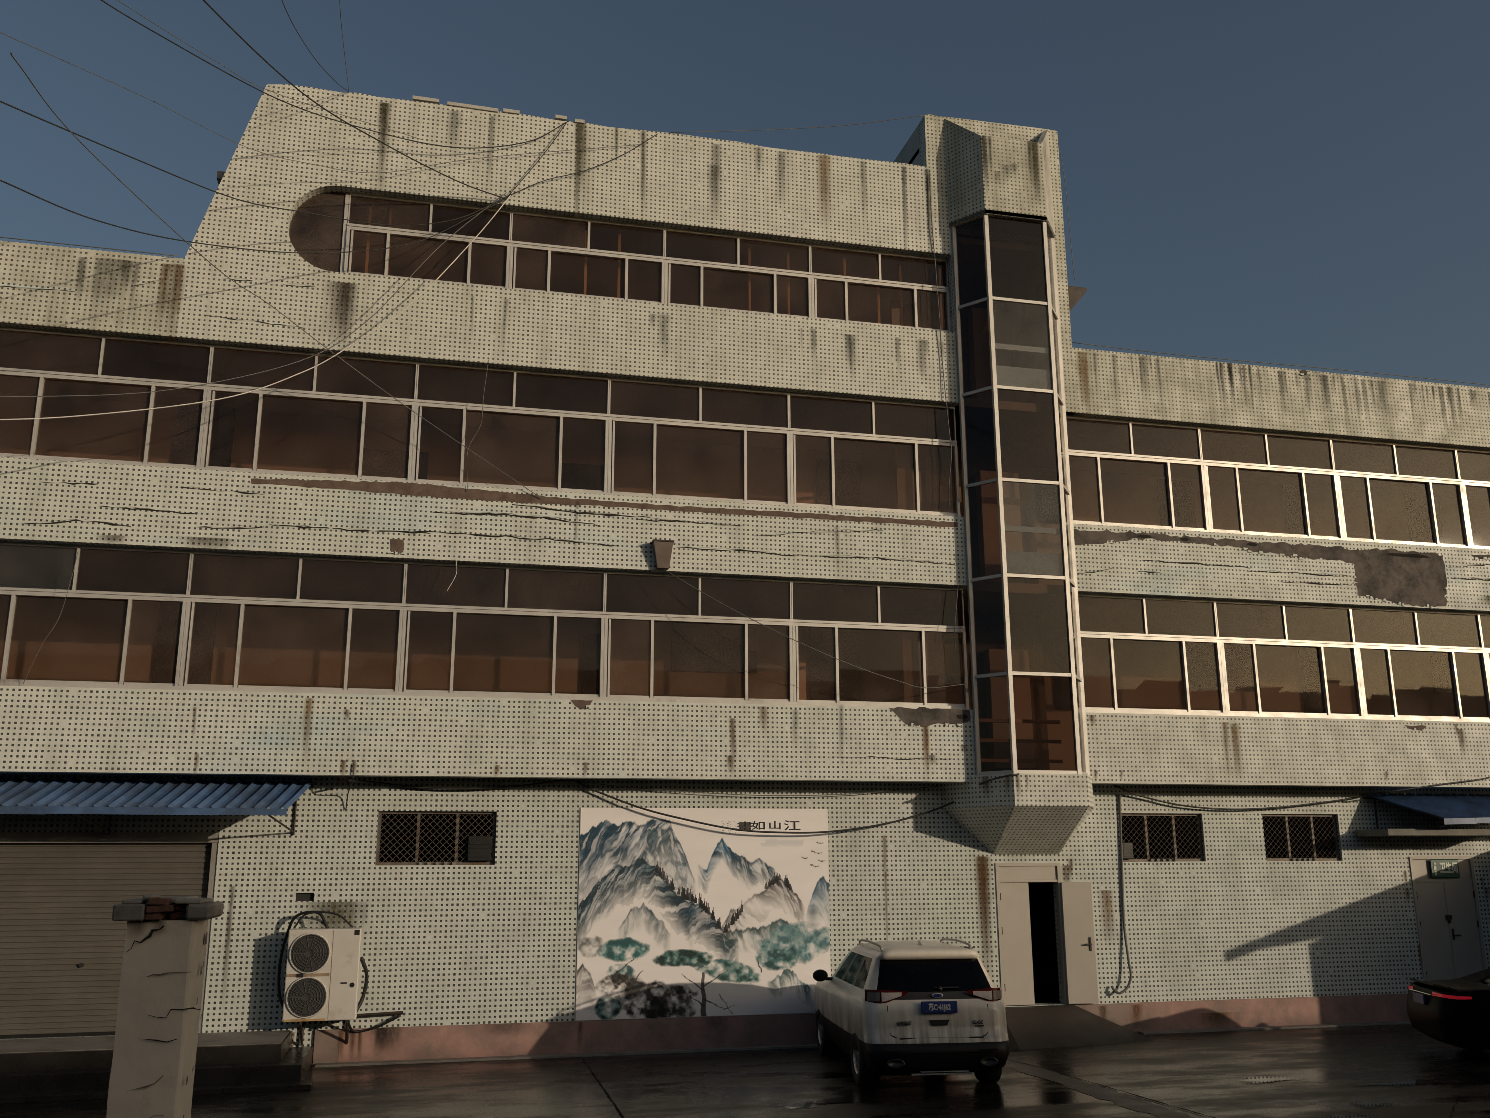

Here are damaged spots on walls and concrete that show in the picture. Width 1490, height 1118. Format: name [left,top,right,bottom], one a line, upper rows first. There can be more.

damp [380,102,388,141]
damp [576,123,585,185]
peeling [1074,529,1449,609]
peeling [890,707,973,727]
crack [127,925,201,1118]